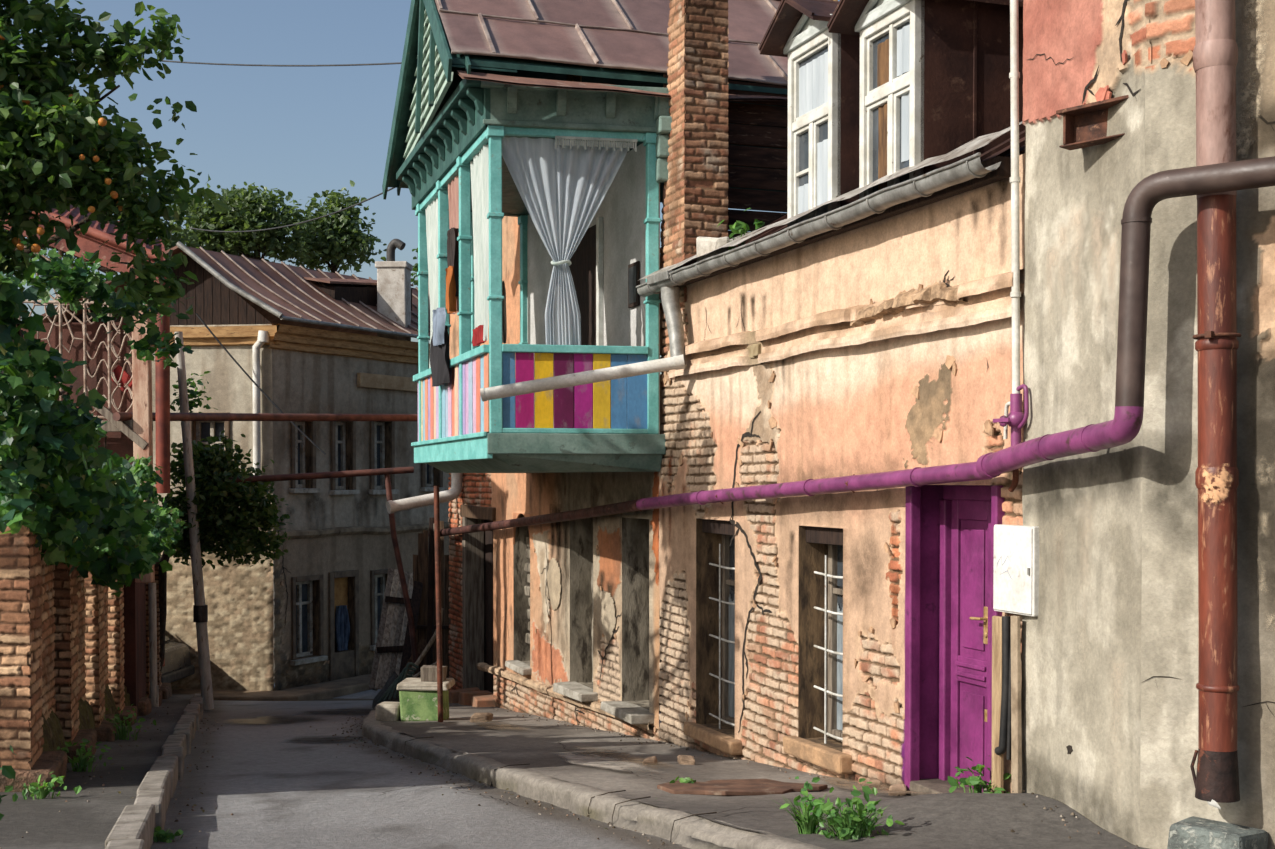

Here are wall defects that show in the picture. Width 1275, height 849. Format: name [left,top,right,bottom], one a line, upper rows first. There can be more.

crack [1027,0,1140,104]
spalling [1081,0,1195,105]
spalling [680,291,689,345]
flaking render [1253,215,1275,360]
flaking render [903,355,957,468]
spalling [493,309,905,790]
crack [729,411,772,733]